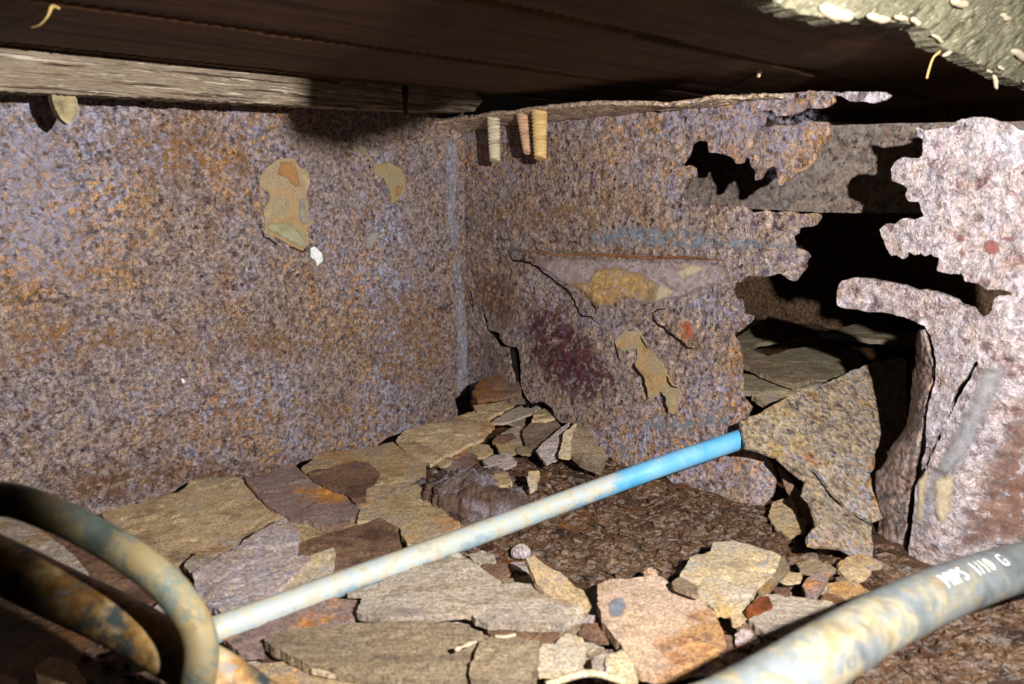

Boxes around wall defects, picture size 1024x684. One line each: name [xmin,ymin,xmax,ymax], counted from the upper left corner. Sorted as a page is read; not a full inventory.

rust [113,130,249,178]
peeling [259,158,323,266]
spalling [985,237,1013,254]
rust [10,316,222,363]
crack [470,290,544,407]
rust [527,309,612,399]
spalling [615,330,681,414]
crack [625,297,695,350]
crack [953,361,978,408]
rust [66,465,229,500]
crack [917,434,941,482]
peeling [916,369,1004,527]